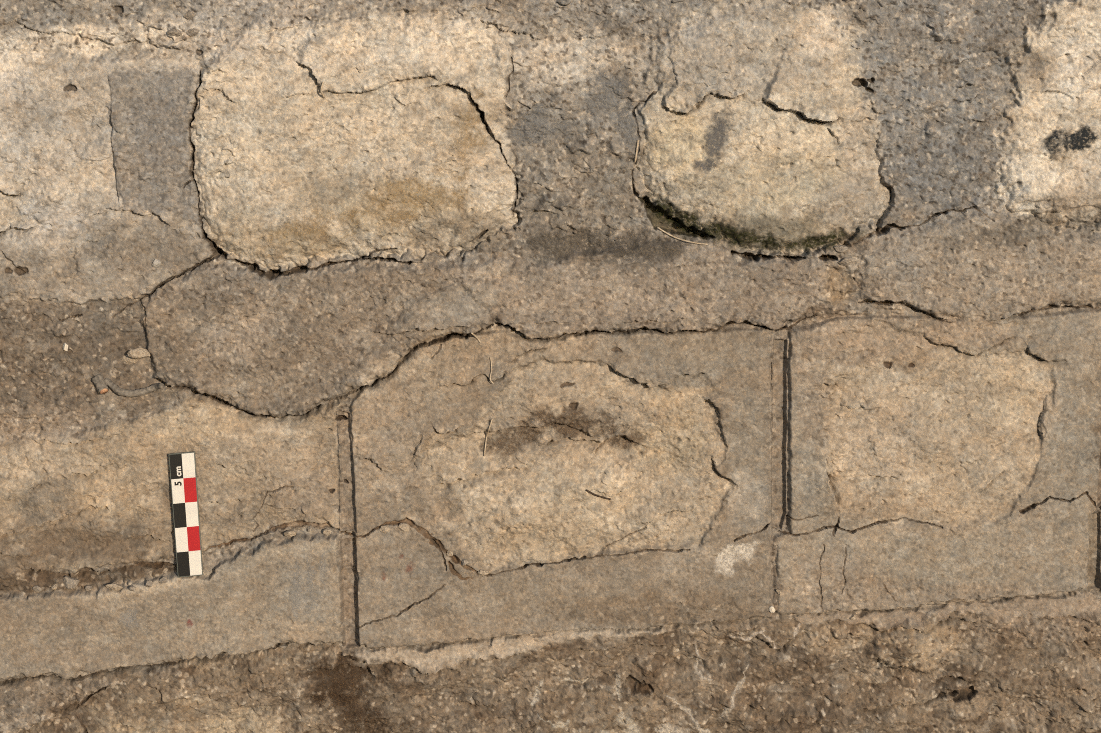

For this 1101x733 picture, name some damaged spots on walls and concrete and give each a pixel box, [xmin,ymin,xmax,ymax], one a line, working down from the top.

crack [470,57,519,218]
crack [632,91,658,197]
crack [113,71,412,327]
crack [471,229,489,242]
crack [157,315,817,419]
crack [1019,492,1097,514]
crack [131,561,177,569]
crack [206,486,691,628]
crack [734,515,943,612]
crack [266,642,292,650]
crack [0,657,198,733]